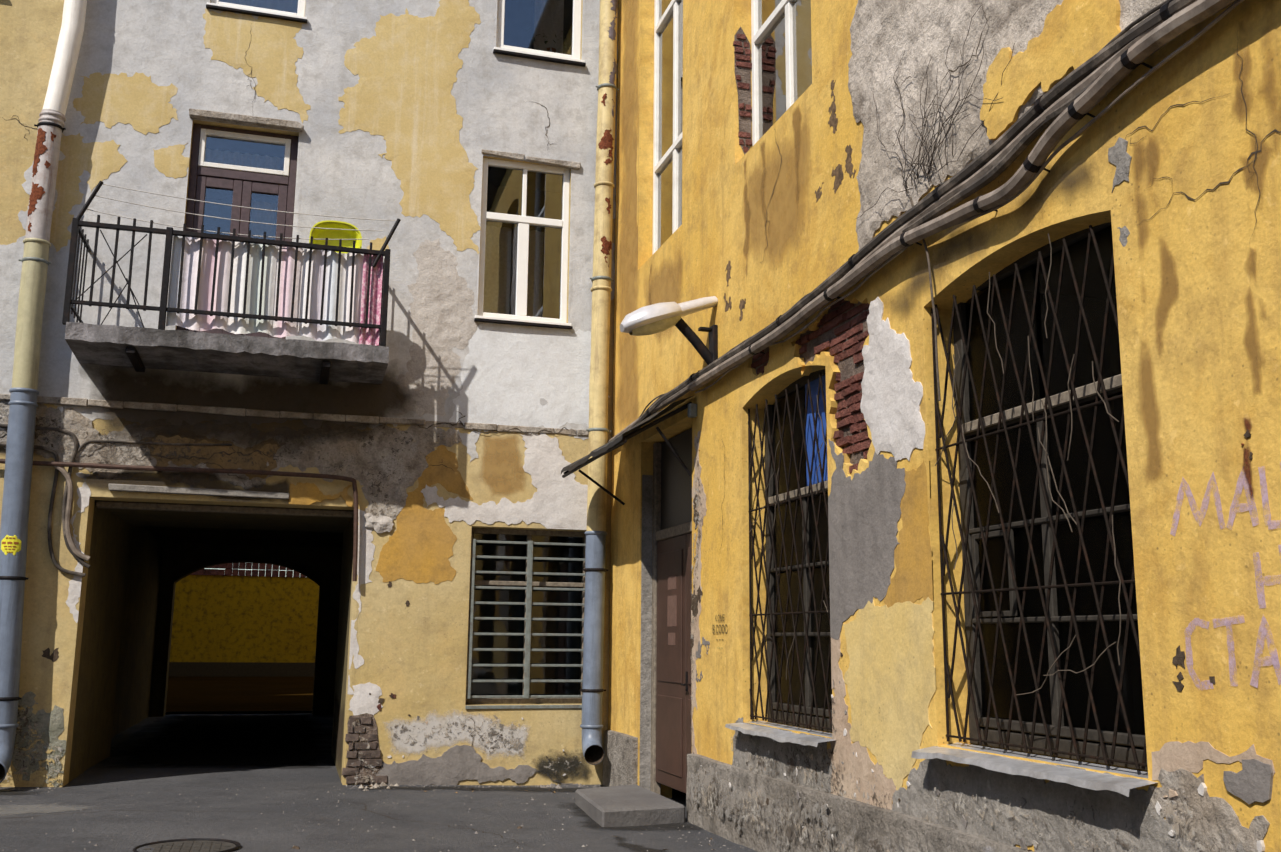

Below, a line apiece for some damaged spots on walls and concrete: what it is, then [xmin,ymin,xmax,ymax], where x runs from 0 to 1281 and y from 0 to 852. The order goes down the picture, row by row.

corrosion [28,128,56,232]
flaking render [733,26,752,155]
leakage [743,108,805,273]
spalling [815,0,1166,251]
leakage [1136,140,1158,179]
crack [1126,31,1281,244]
flaking render [33,0,619,785]
flaking render [795,296,933,607]
leakage [1141,359,1159,474]
leakage [1158,246,1176,345]
leakage [1245,293,1259,390]
spalling [689,430,1275,852]